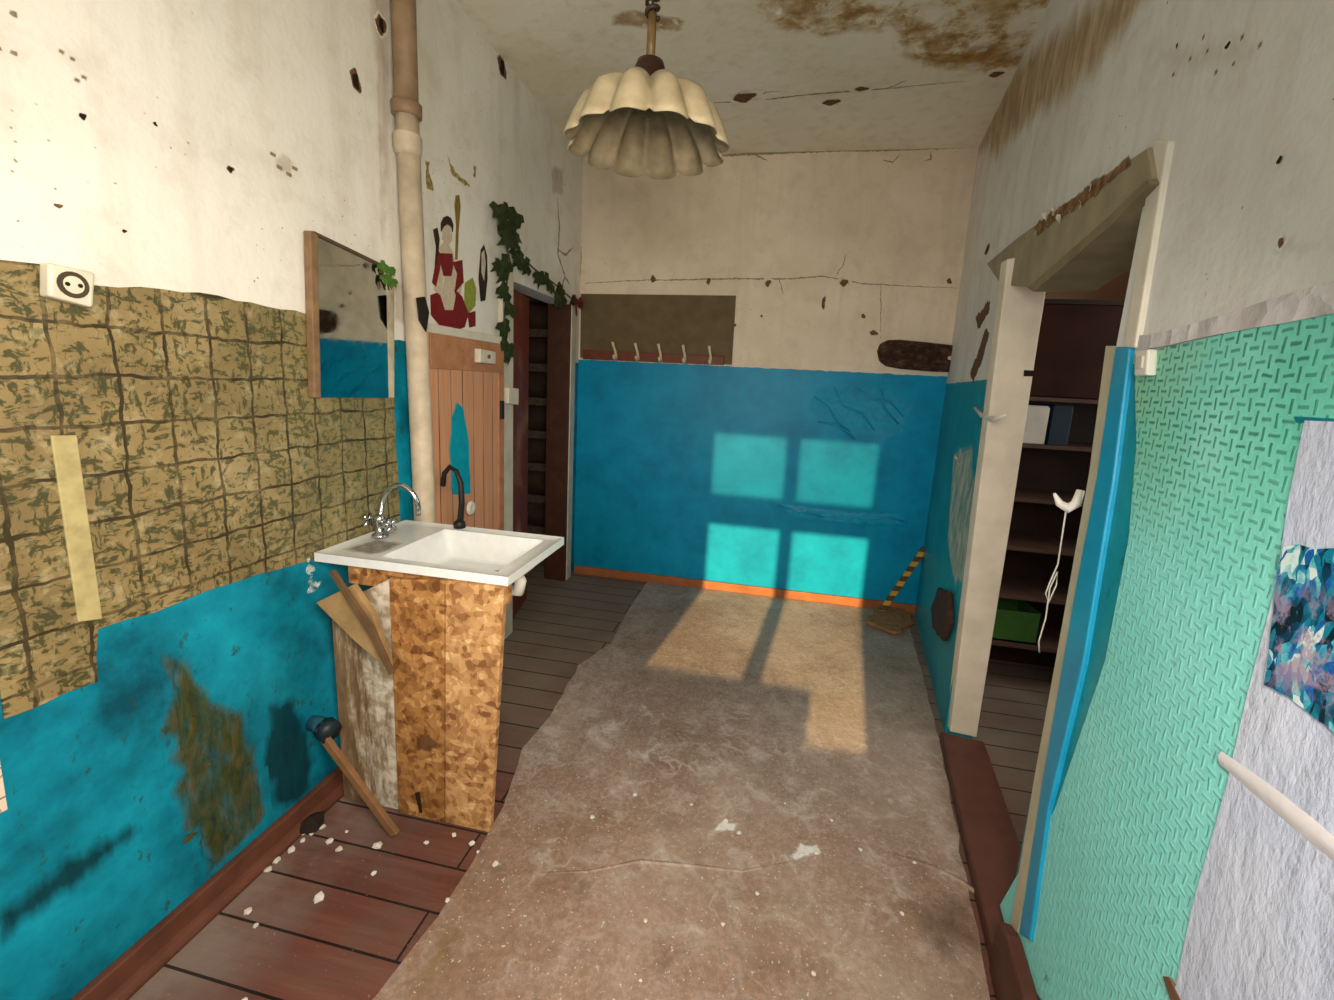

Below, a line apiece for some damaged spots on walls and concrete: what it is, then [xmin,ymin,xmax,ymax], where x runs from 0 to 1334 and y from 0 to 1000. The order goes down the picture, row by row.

damp [740,0,1169,173]
damp [174,658,319,864]
damp [0,811,153,950]